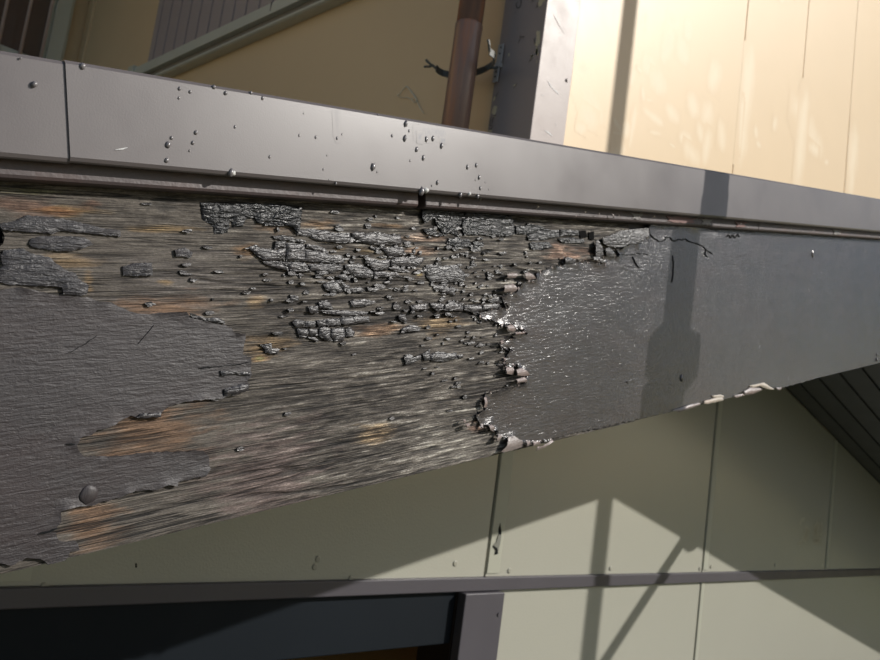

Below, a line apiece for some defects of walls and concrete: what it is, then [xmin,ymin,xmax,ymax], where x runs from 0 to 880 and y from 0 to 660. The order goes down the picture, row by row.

crack [620,228,712,282]
peeling [0,181,655,558]
peeling [0,558,46,574]